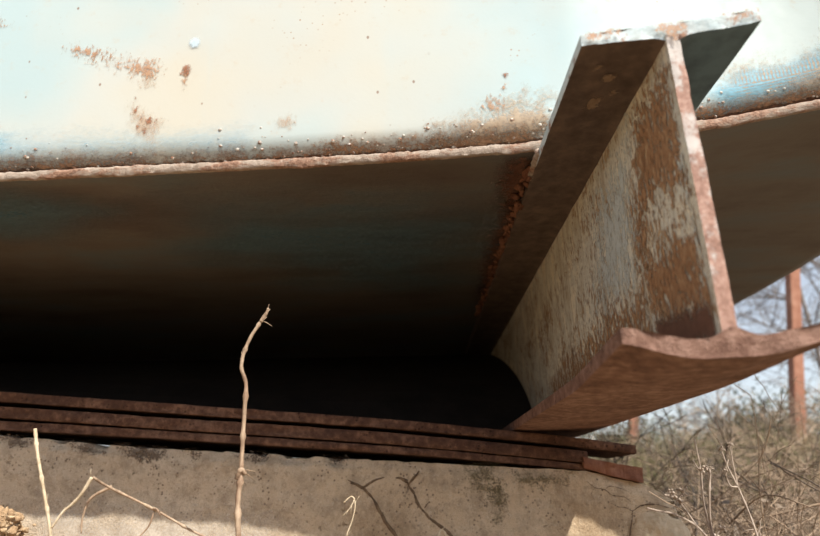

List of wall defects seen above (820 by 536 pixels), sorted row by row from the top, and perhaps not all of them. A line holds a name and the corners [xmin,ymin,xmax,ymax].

corrosion [585,28,620,41]
corrosion [656,20,688,41]
corrosion [62,45,160,82]
corrosion [695,56,820,120]
corrosion [0,73,552,173]
corrosion [549,55,716,393]
crack [588,482,669,536]